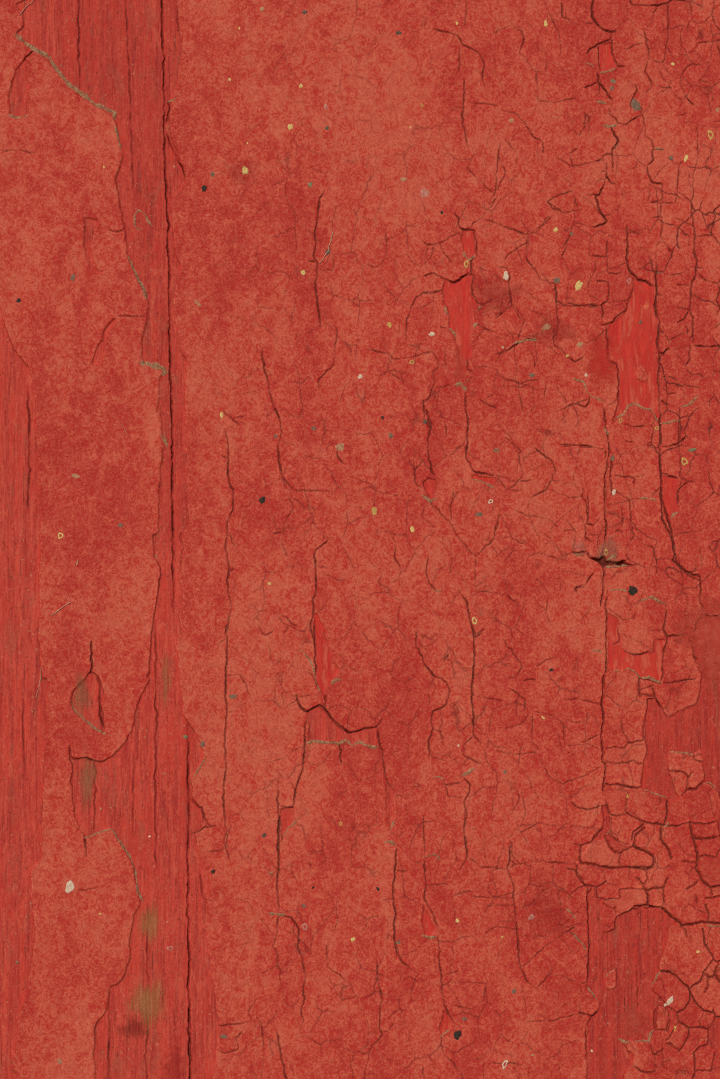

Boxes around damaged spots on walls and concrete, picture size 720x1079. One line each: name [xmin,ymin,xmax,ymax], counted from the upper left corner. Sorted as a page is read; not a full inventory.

peeling [0,307,48,1079]
peeling [8,0,220,1079]
crack [125,0,136,201]
crack [131,0,189,870]
crack [186,410,396,1079]
crack [260,339,332,535]
crack [307,188,338,392]
peeling [268,614,461,1073]
peeling [422,211,496,392]
crack [366,0,720,1023]
peeling [600,225,679,428]
peeling [564,461,720,1079]